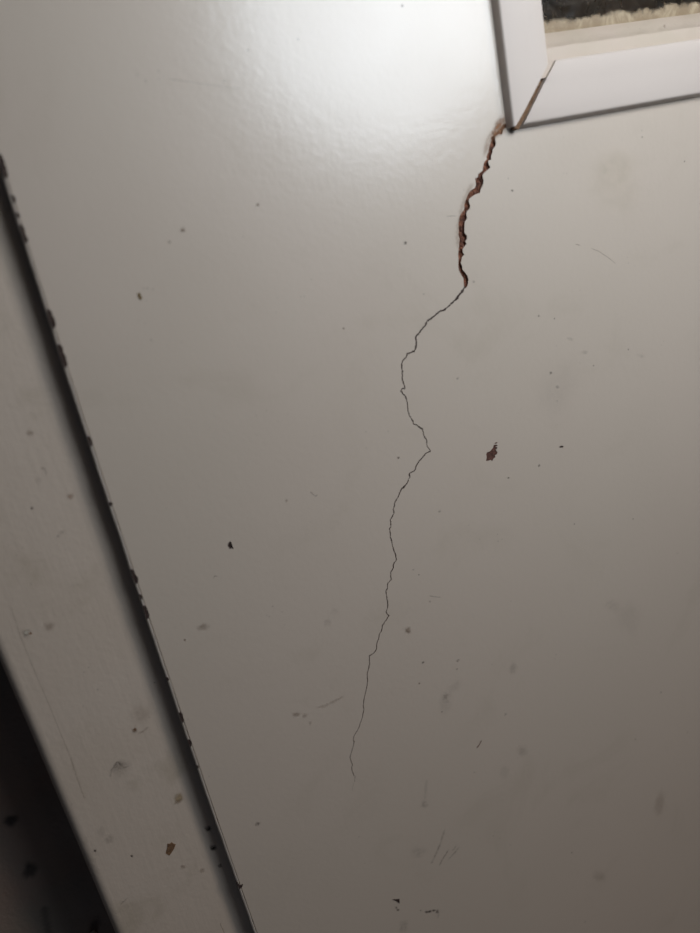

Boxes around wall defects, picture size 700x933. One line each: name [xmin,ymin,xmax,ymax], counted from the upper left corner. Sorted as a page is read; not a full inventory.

crack [350,124,506,776]